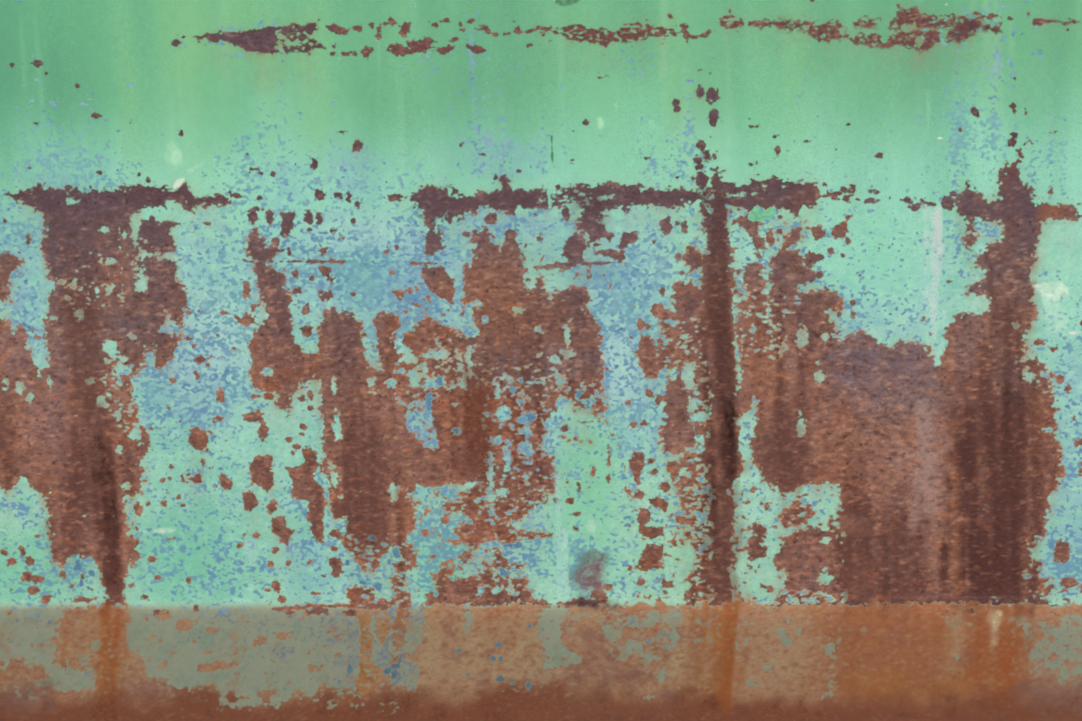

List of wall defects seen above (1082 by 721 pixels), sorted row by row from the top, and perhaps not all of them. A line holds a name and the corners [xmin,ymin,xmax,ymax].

corrosion [171,4,1014,60]
corrosion [0,233,33,303]
peeling [0,78,178,355]
corrosion [279,243,346,302]
peeling [725,0,1082,375]
peeling [104,2,846,697]
corrosion [159,415,224,507]
corrosion [236,454,296,568]
corrosion [623,451,659,503]
peeling [1022,261,1082,600]
corrosion [0,545,53,612]
peeling [0,486,105,651]